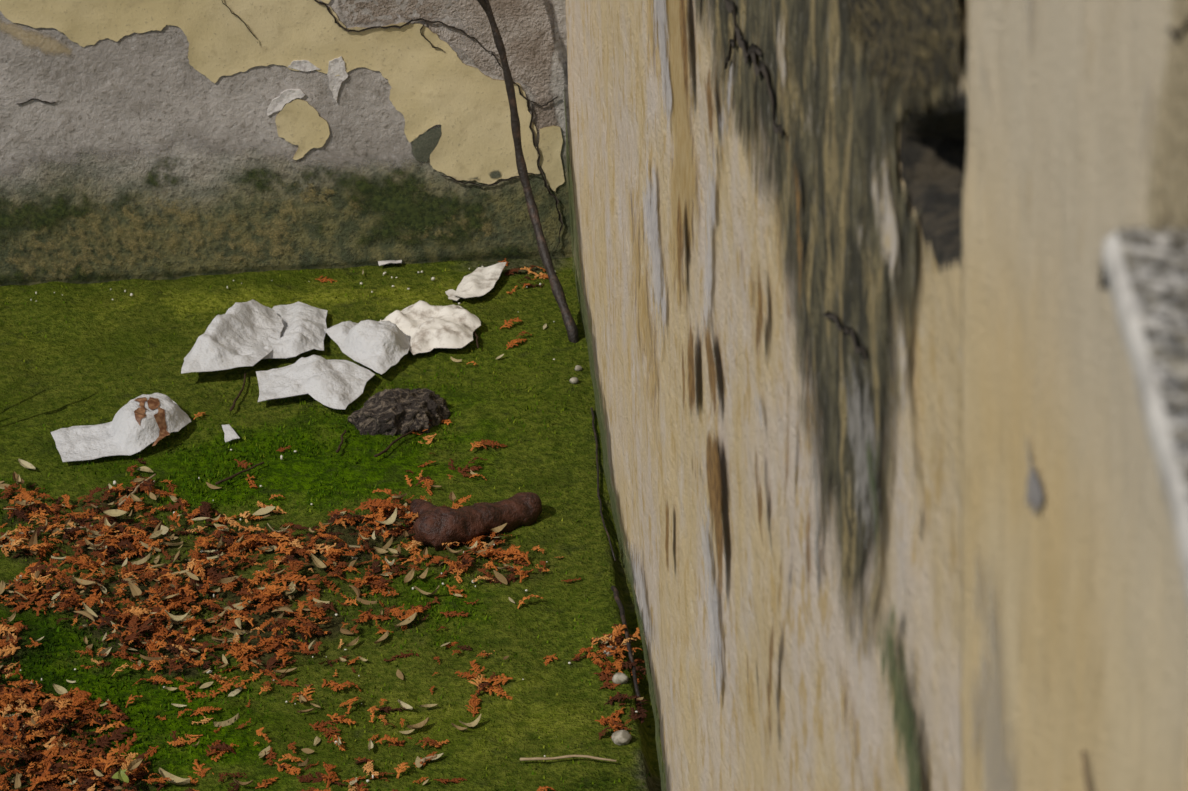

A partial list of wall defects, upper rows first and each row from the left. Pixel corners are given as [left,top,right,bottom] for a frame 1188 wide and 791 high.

peeling [0,11,442,175]
flaking render [319,0,558,132]
crack [724,0,786,136]
crack [1167,22,1188,40]
damp [848,377,880,536]